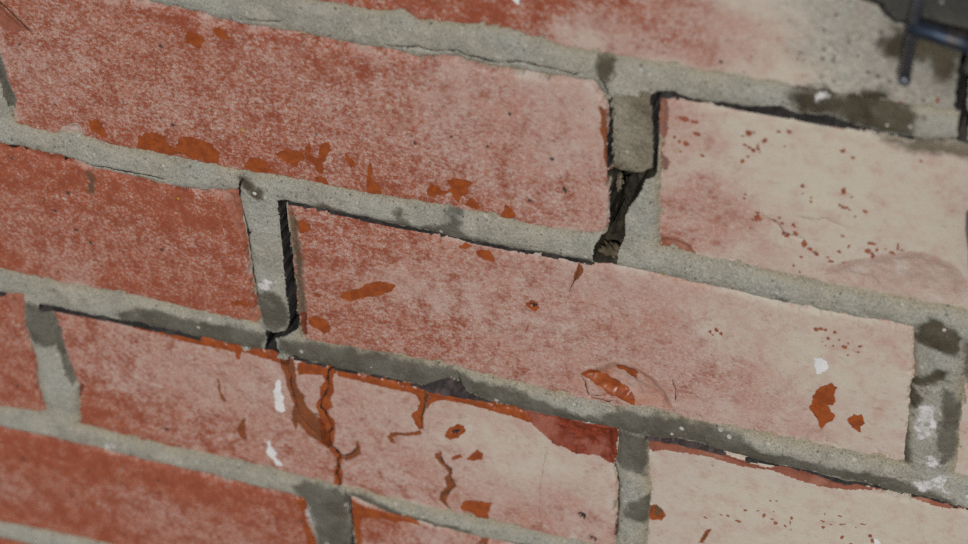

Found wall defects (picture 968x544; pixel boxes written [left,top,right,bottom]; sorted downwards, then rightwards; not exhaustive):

crack [650,53,968,173]
water stain [791,87,968,156]
crack [264,200,595,544]
spalling [370,374,619,464]
water stain [119,216,968,544]
spalling [581,361,673,409]